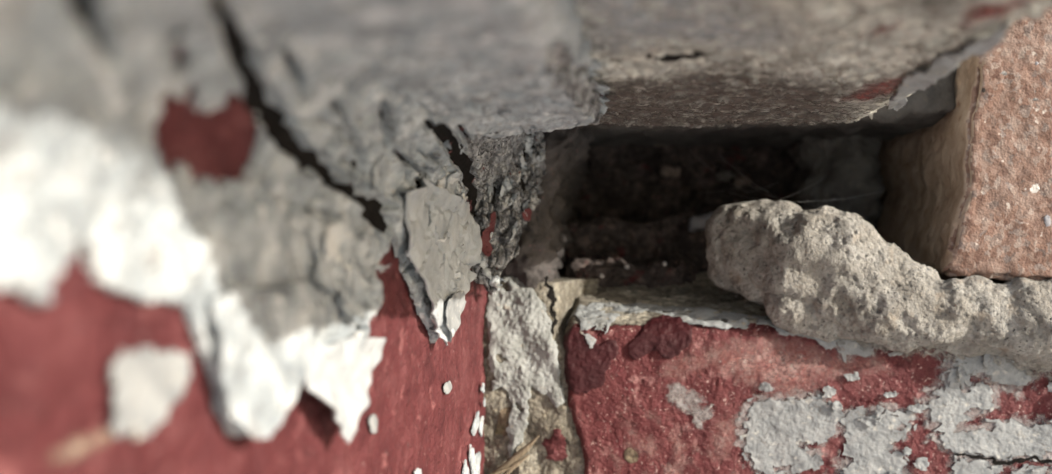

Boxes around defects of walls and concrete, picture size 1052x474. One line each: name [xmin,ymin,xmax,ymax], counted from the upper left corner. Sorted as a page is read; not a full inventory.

crack [212,0,388,234]
peeling [0,0,610,474]
crack [379,99,421,189]
crack [424,119,527,235]
crack [544,276,558,334]
peeling [566,302,1052,474]